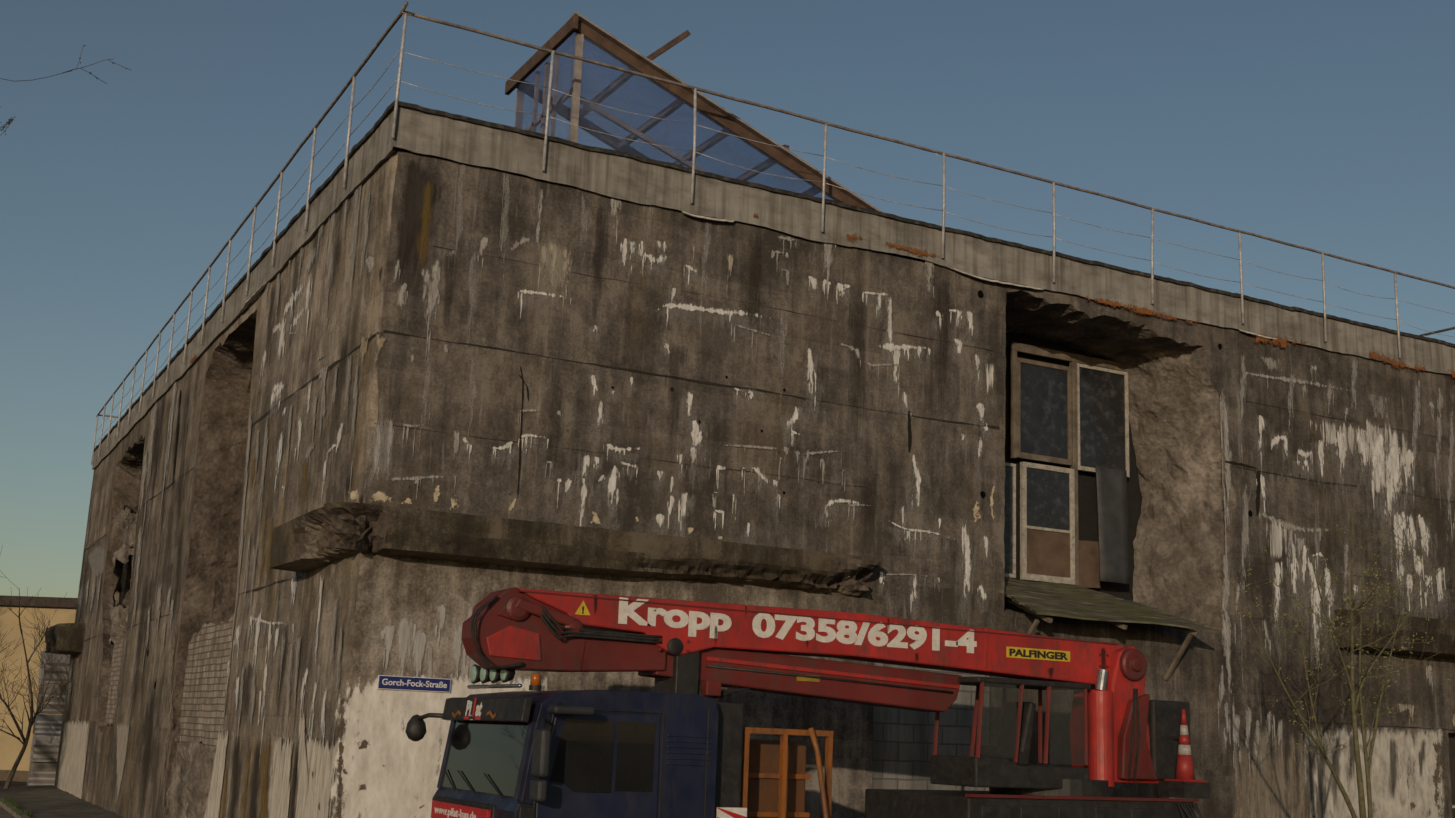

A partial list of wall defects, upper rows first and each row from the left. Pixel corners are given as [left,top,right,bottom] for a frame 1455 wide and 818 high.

damp [611,198,667,270]
damp [658,246,770,353]
damp [771,236,797,285]
damp [808,242,931,414]
damp [924,261,994,456]
rust [1087,296,1196,323]
damp [1218,356,1455,818]